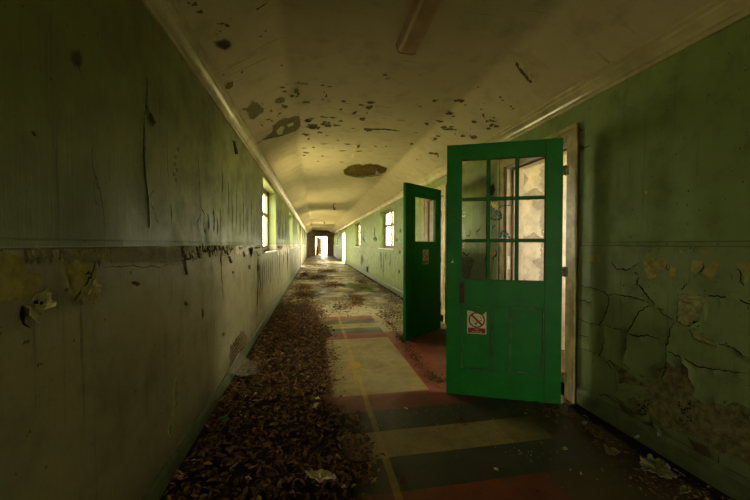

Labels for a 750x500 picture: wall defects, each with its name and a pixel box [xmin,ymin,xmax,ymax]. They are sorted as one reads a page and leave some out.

crack [140,76,172,230]
peeling [239,81,404,178]
peeling [423,102,501,141]
flaking render [0,241,262,328]
crack [577,275,750,392]